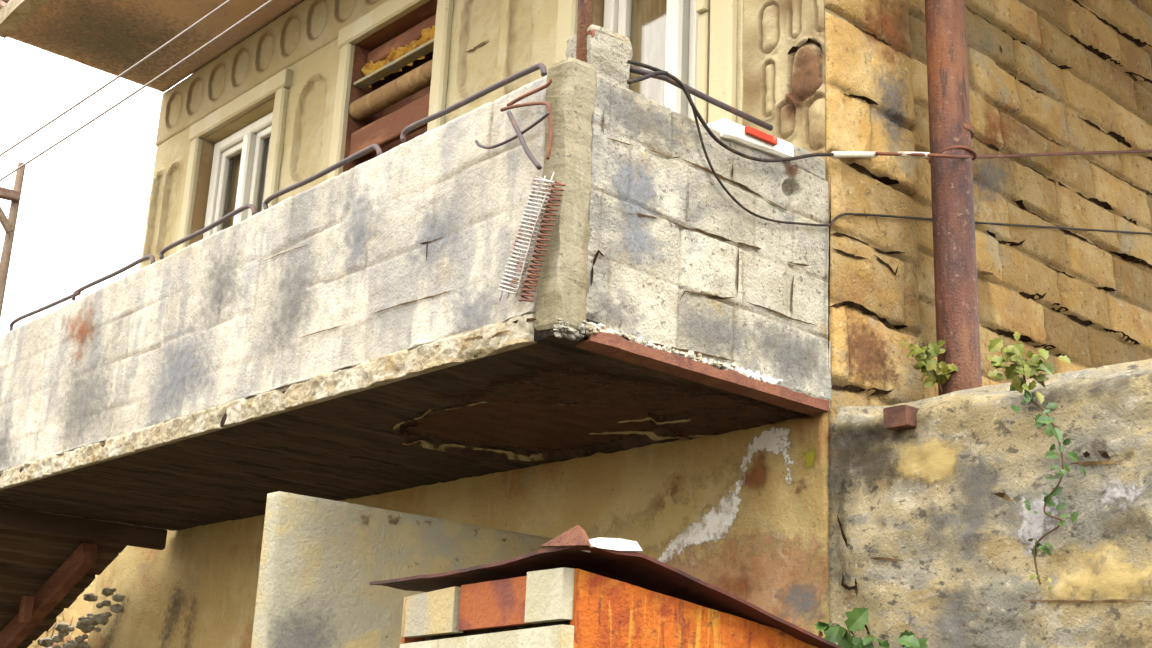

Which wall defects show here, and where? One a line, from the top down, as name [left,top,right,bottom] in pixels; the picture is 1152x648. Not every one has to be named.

spalling [475,78,553,170]
rust [69,310,91,357]
spalling [553,317,598,341]
rust [445,363,813,440]
peeling [671,352,783,384]
water stain [657,426,795,563]